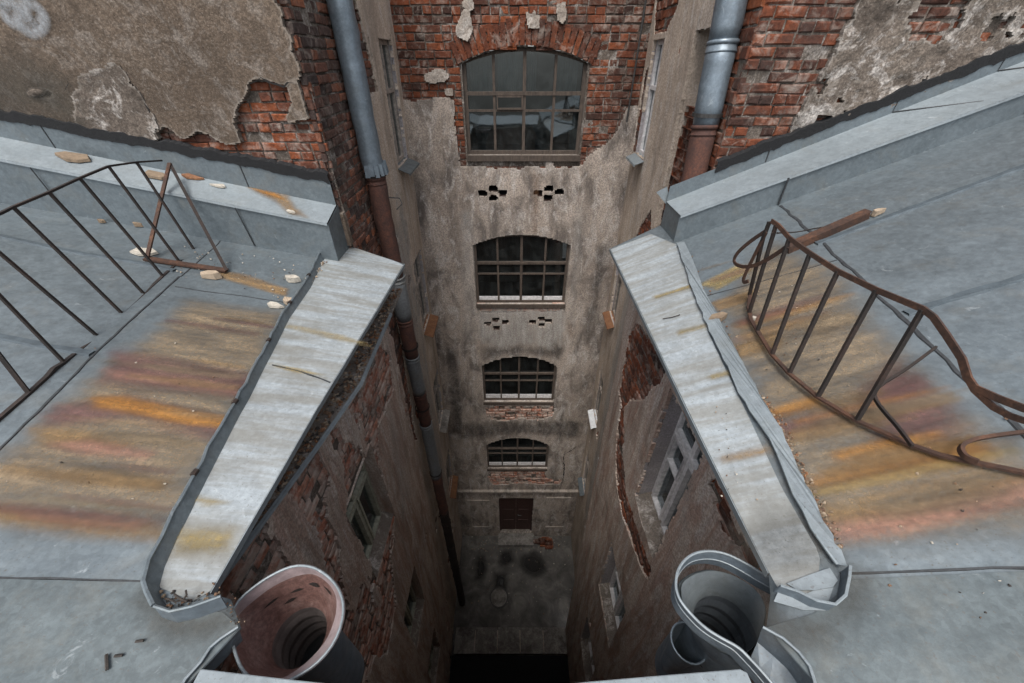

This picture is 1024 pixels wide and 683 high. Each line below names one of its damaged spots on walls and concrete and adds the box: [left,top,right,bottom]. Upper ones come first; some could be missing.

flaking render [71,62,334,173]
flaking render [390,0,655,168]
flaking render [789,0,1024,133]
rust [0,307,275,528]
flaking render [486,406,554,421]
flaking render [487,471,561,485]
flaking render [616,324,665,577]
rust [704,249,1024,530]